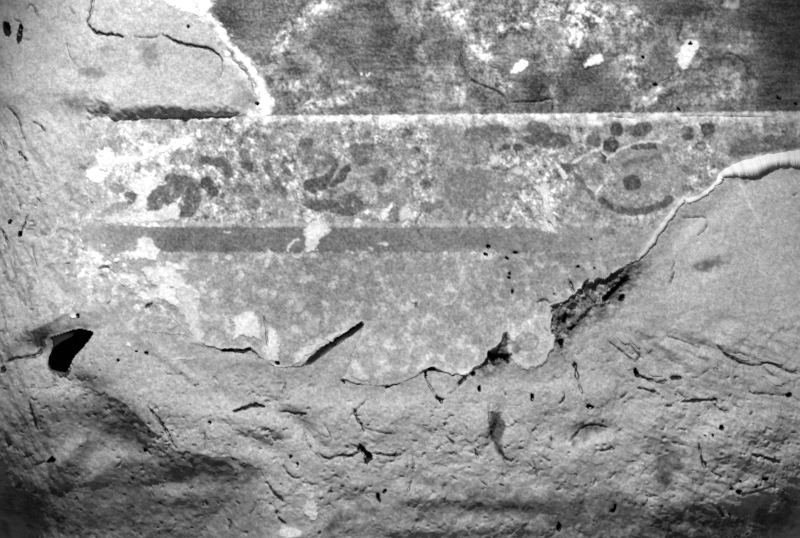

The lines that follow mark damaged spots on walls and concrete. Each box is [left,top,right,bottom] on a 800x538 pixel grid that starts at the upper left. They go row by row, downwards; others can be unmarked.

crack [71,0,223,74]
peeling [85,136,195,184]
crack [307,322,363,362]
flaking render [0,150,800,538]